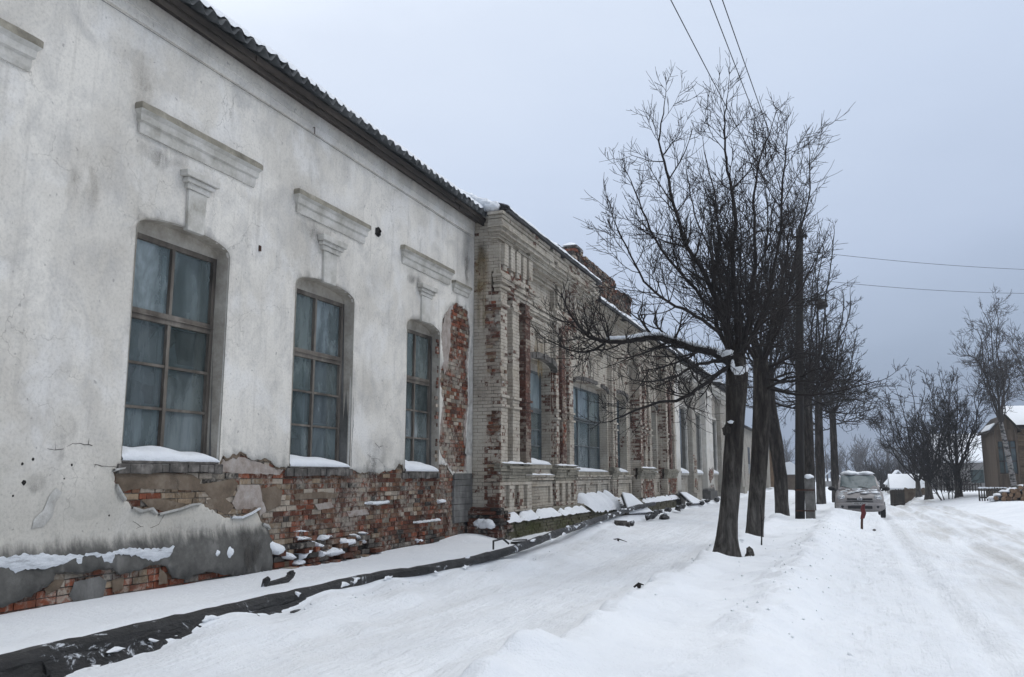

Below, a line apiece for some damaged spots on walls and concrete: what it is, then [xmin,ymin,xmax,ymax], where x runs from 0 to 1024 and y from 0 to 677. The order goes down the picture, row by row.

spalling [113,299,514,570]
peeling [642,479,655,498]
spalling [0,565,231,615]